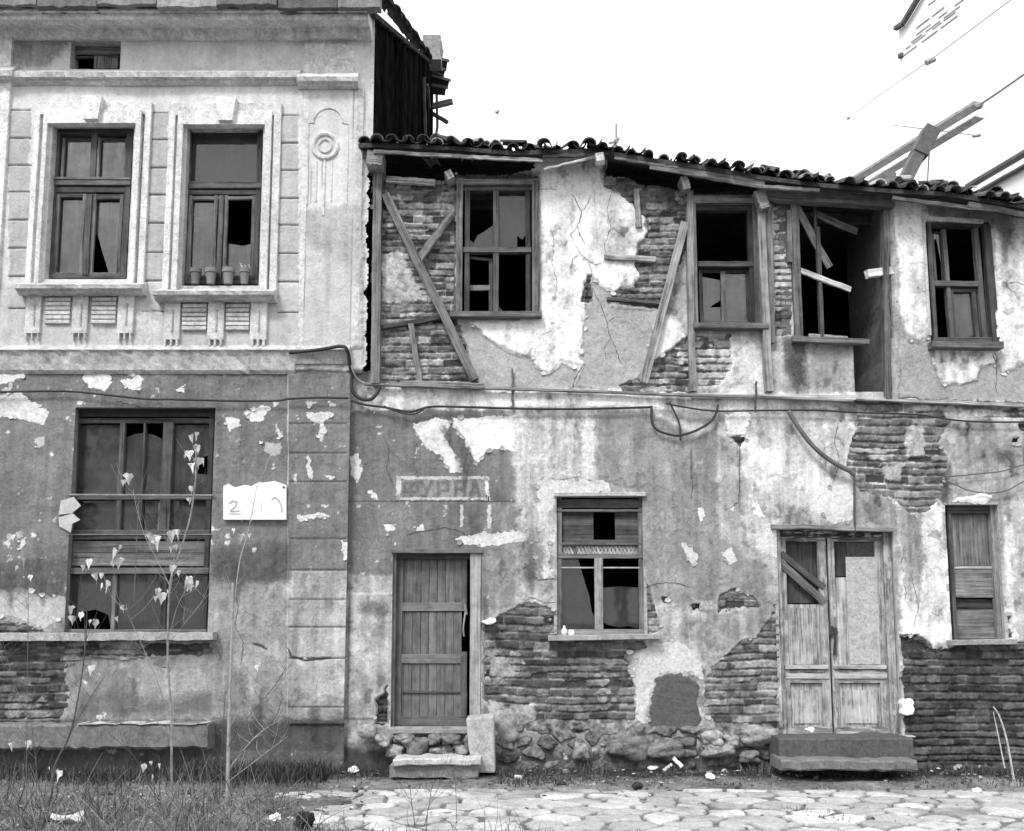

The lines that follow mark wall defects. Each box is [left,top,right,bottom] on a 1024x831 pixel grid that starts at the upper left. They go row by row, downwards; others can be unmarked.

spalling [370,166,733,393]